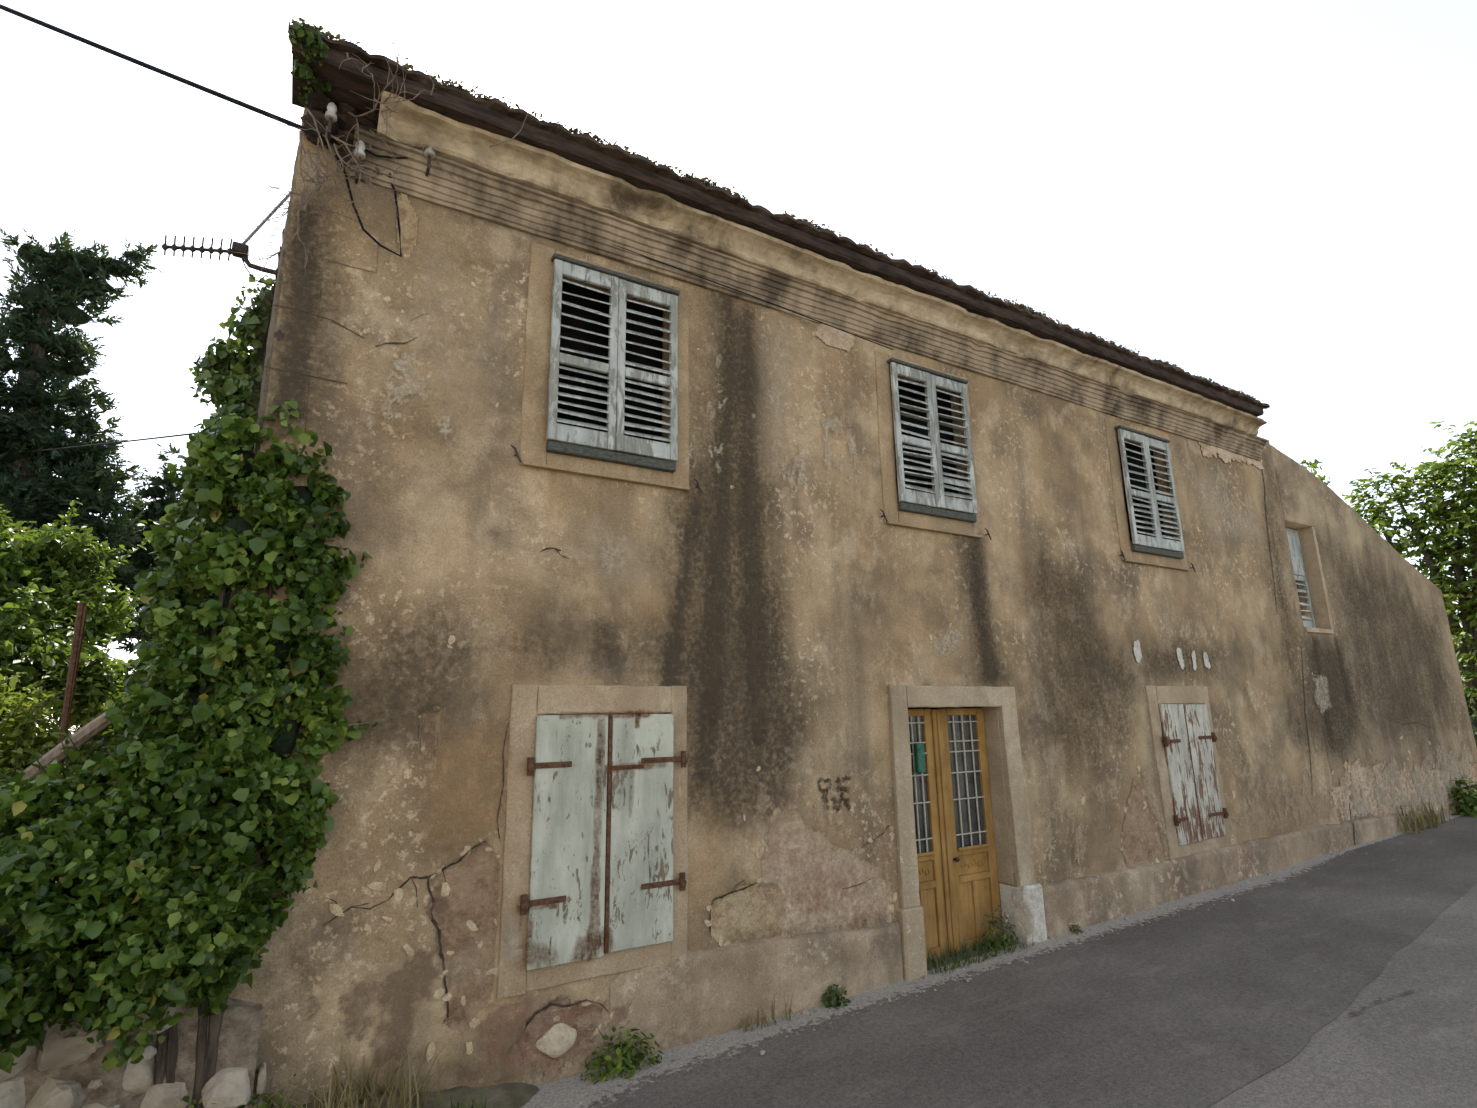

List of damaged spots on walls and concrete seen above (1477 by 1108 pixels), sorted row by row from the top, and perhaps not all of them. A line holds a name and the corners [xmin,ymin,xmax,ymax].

crack [262,229,284,362]
water stain [650,295,802,824]
water stain [353,615,470,744]
crack [322,723,509,1018]
spalling [704,766,897,947]
spalling [1231,736,1477,825]